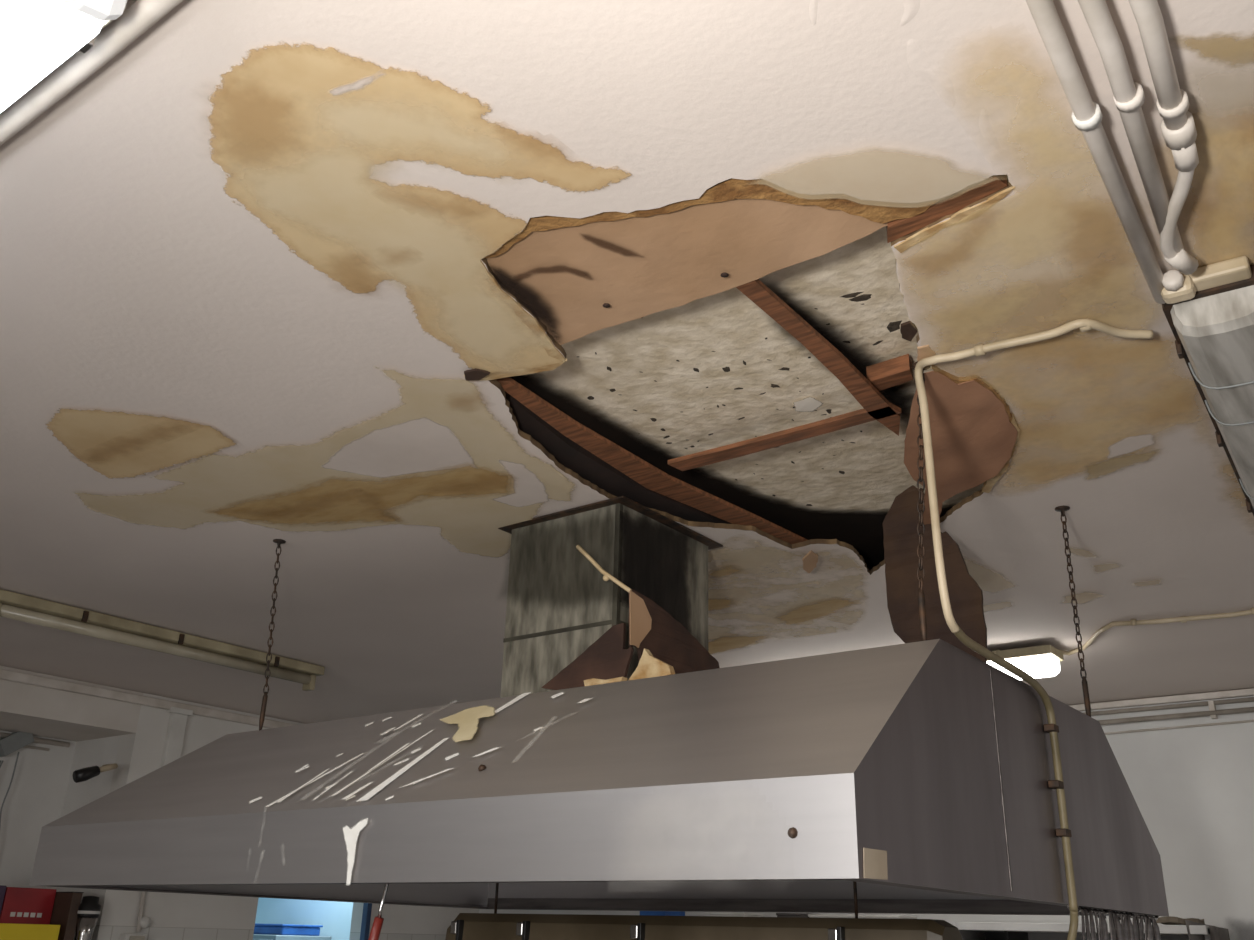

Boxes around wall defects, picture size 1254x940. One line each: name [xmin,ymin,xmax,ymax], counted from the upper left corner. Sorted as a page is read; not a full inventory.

water stain [1184,37,1254,268]
water stain [46,43,632,557]
peeling [464,368,490,381]
spalling [507,374,888,573]
spalling [760,359,832,421]
spalling [765,284,936,379]
spalling [879,384,914,422]
water stain [908,69,1196,484]